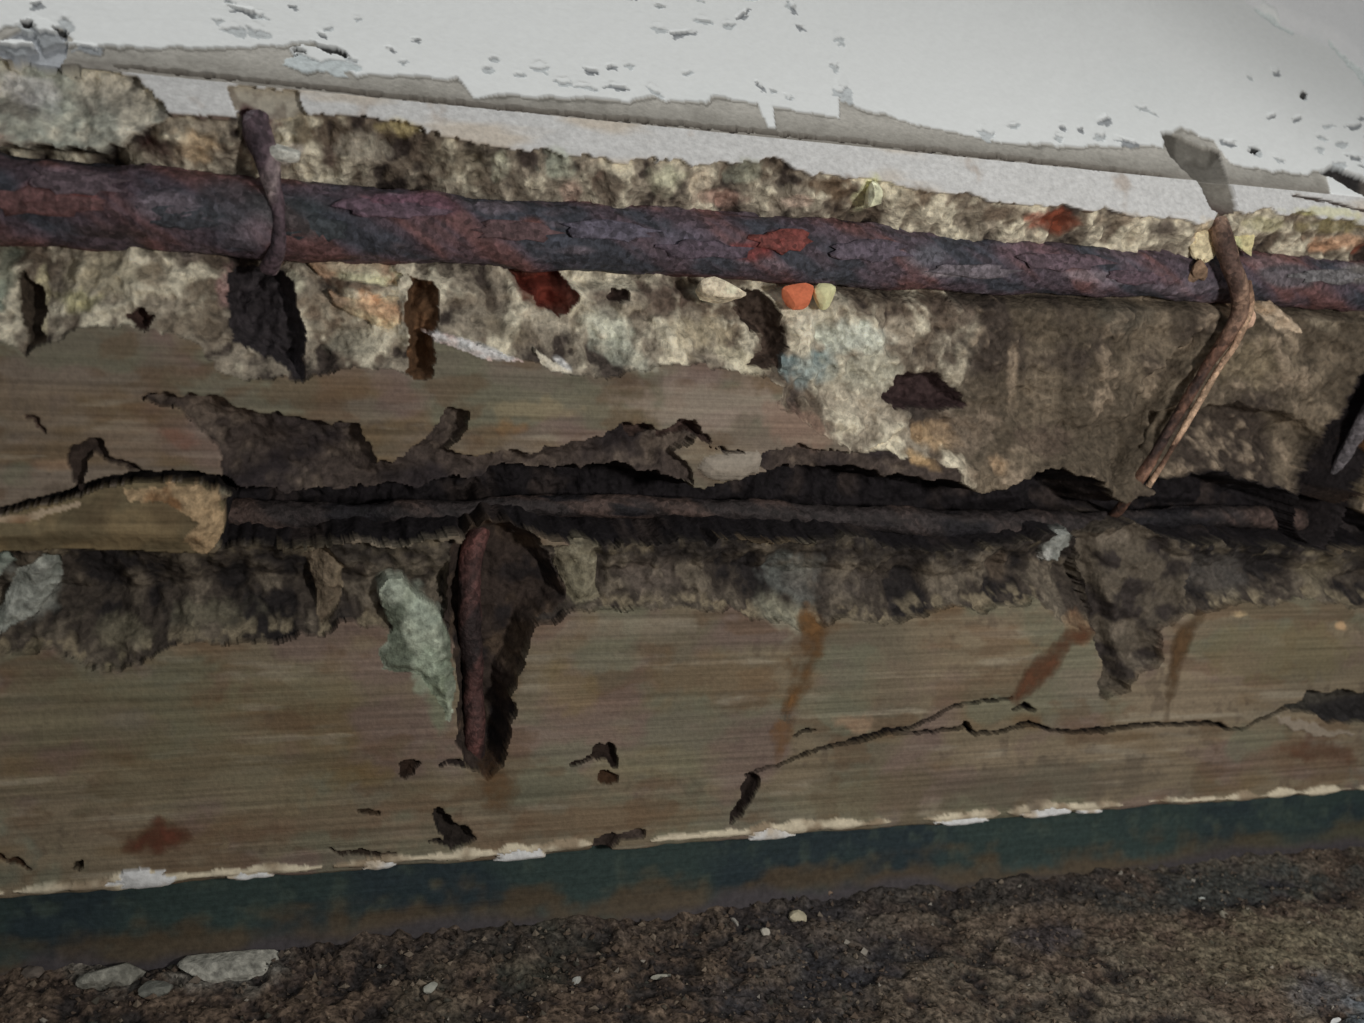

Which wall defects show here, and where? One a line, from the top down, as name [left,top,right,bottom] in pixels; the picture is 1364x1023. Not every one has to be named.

flaking render [0,0,1364,194]
rust [0,168,228,231]
rust [559,219,662,242]
rust [747,228,813,255]
spalling [270,112,1364,261]
rust [829,239,913,263]
rust [924,253,1168,286]
rust [1041,209,1077,233]
rust [1288,269,1364,285]
crack [0,437,240,515]
spalling [0,246,1364,673]
crack [744,696,1288,777]